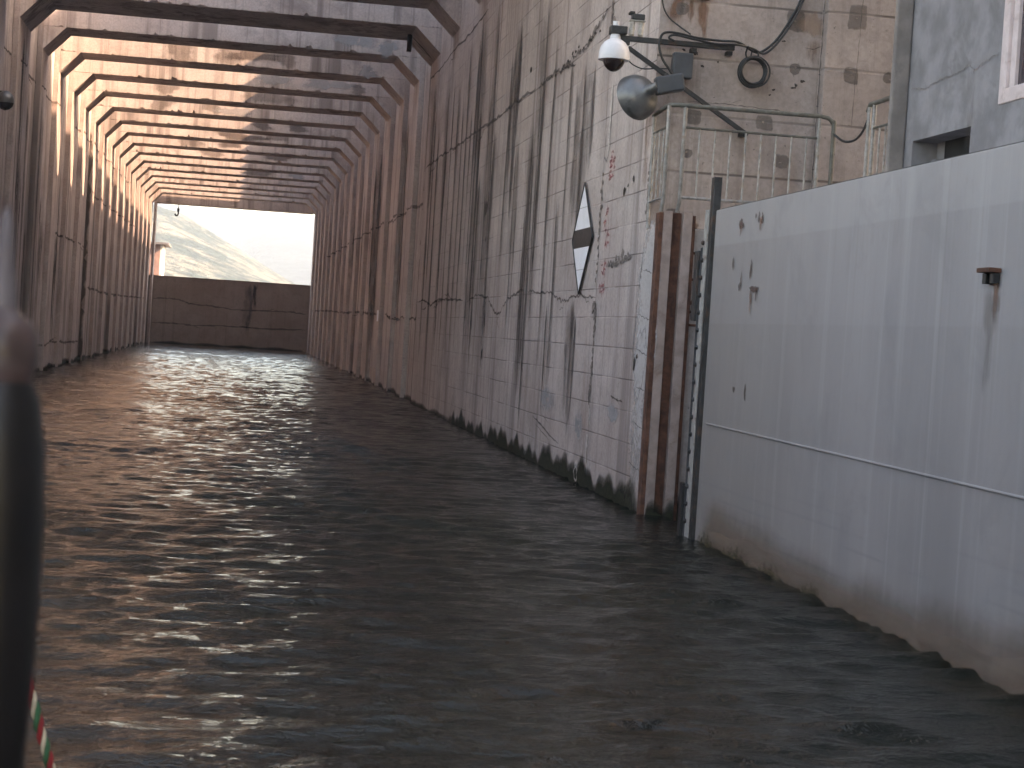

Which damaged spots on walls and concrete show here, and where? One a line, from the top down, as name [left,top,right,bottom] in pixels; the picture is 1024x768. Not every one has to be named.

crack [4,11,631,470]
damp [423,37,556,383]
damp [563,73,595,219]
corrosion [732,257,758,310]
damp [566,315,575,404]